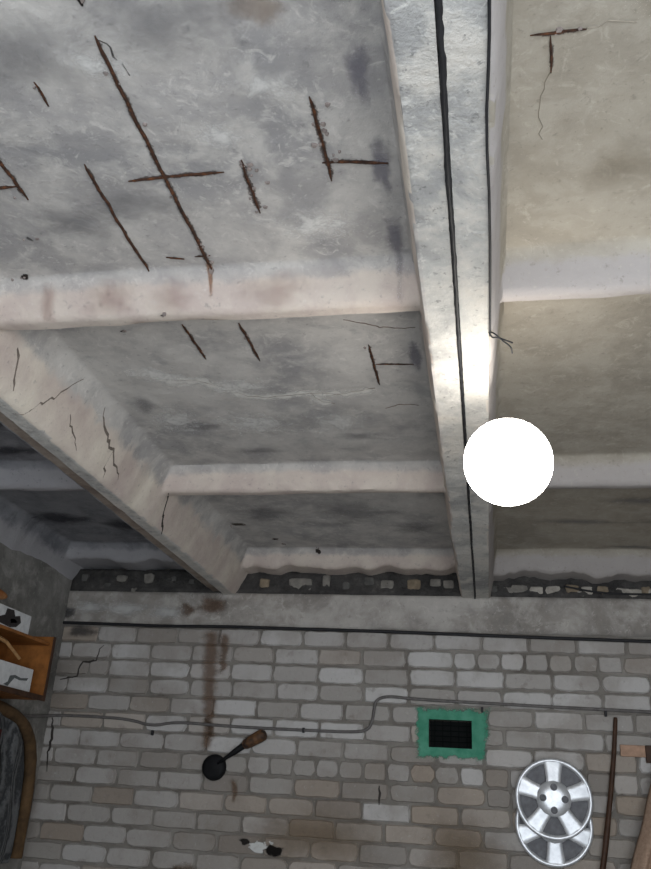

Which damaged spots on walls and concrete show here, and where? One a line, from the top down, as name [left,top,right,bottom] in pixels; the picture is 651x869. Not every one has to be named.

crack [12,348,20,391]
crack [15,379,83,415]
crack [103,408,119,477]
rust [204,634,227,746]